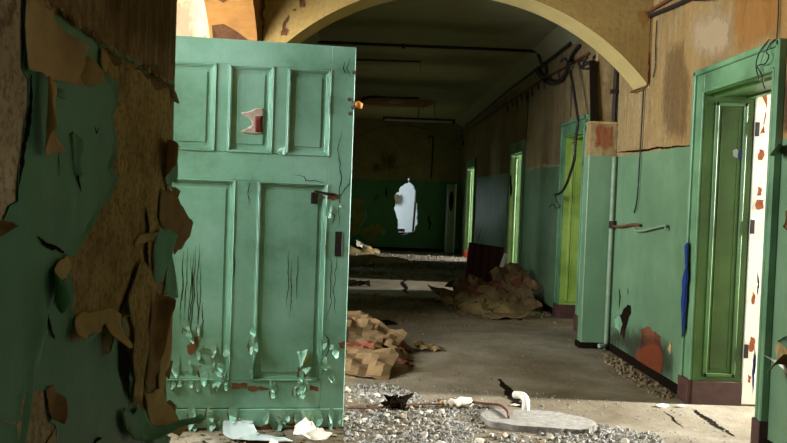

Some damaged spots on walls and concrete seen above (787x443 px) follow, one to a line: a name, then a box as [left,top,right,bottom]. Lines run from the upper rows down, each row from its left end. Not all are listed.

spalling [212,24,248,40]
spalling [281,0,306,36]
flaking render [0,0,242,443]
peeling [612,290,631,336]